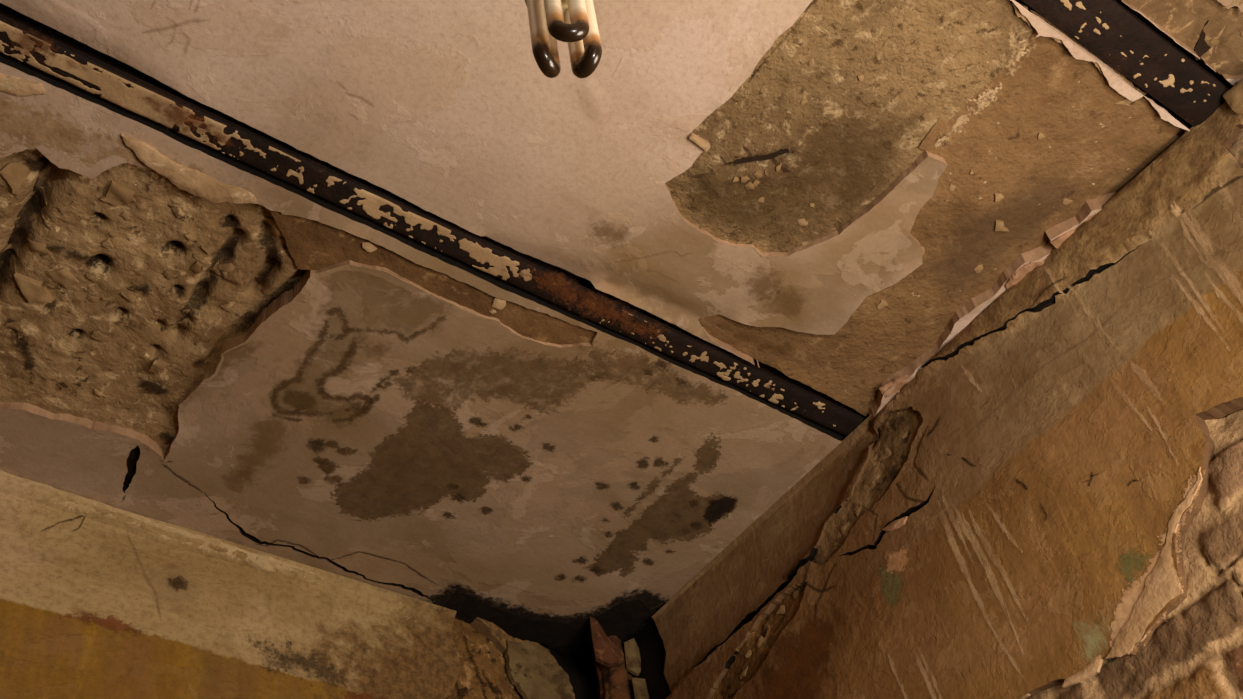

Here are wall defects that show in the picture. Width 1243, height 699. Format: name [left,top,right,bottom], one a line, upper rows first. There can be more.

crack [1195,6,1236,60]
crack [1181,176,1242,214]
rust [522,267,660,338]
flaking render [0,0,1243,522]
crack [1030,267,1109,313]
damp [240,308,444,477]
peeling [0,470,314,574]
crack [123,446,201,500]
damp [307,438,357,486]
peeling [555,433,738,583]
flaking render [1021,410,1243,699]
flaking render [447,619,523,699]